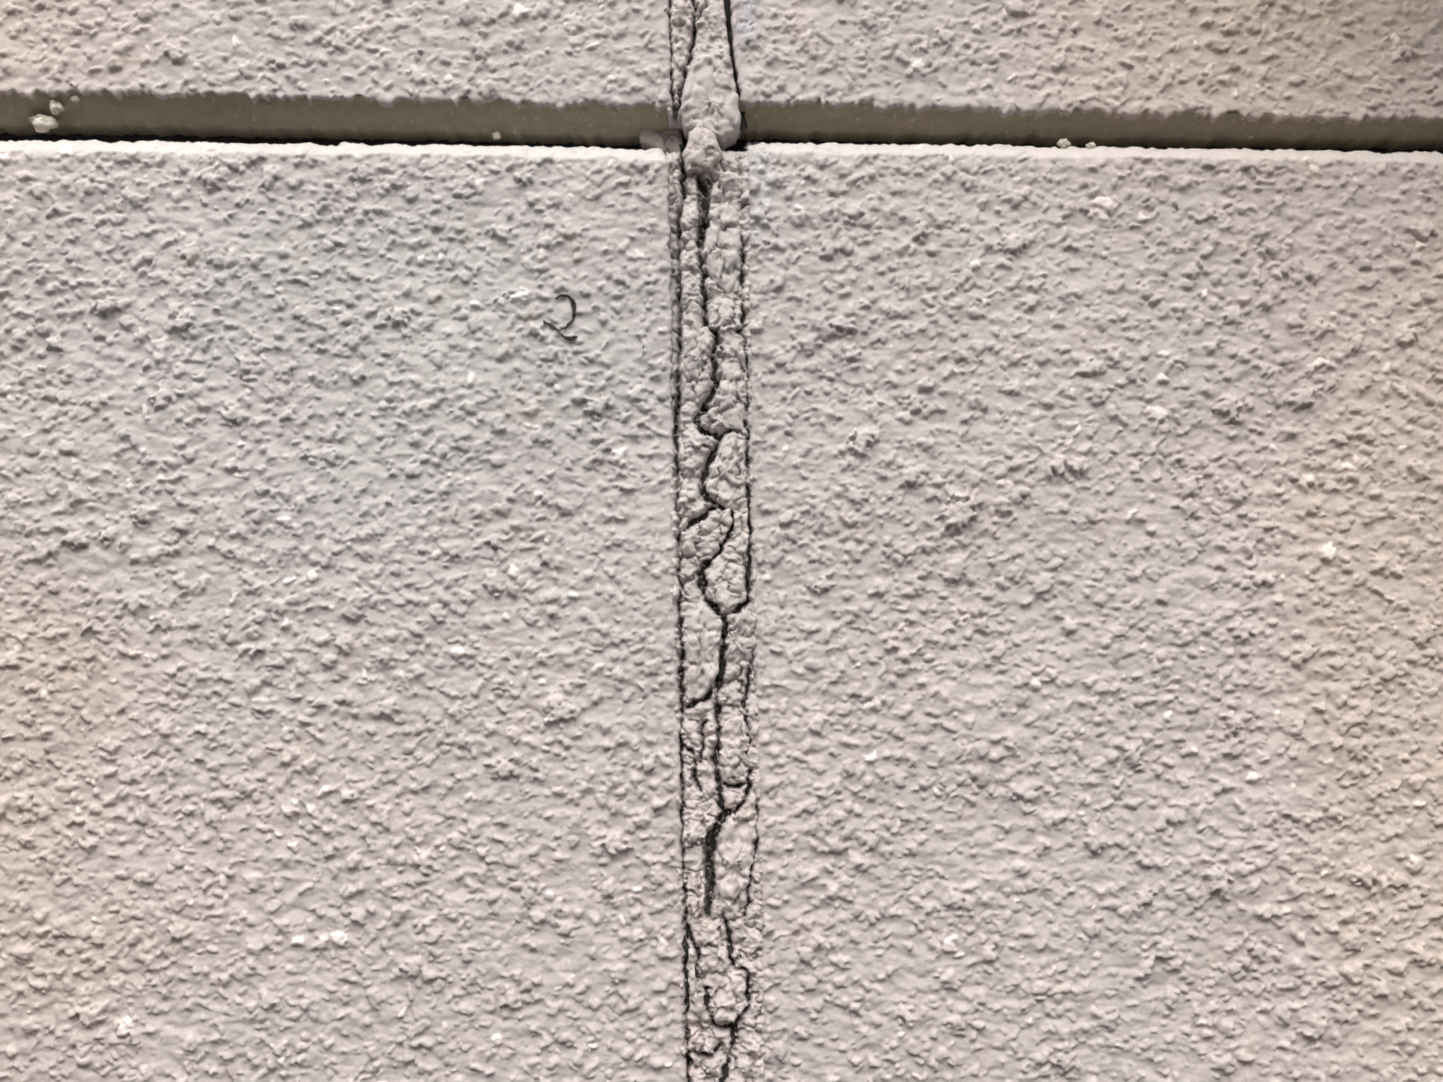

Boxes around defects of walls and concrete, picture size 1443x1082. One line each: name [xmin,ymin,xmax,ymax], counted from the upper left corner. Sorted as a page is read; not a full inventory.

crack [668,0,759,1082]